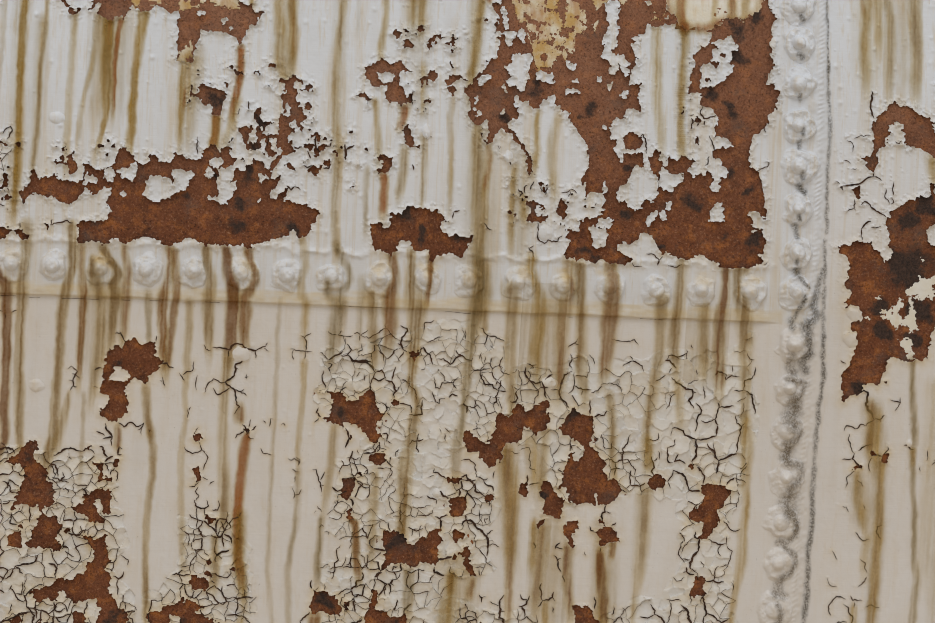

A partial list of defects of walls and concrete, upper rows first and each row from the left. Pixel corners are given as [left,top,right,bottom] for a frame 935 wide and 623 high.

peeling [61,0,265,116]
peeling [0,74,343,249]
peeling [356,0,780,269]
peeling [861,101,935,172]
peeling [838,183,935,402]
peeling [4,440,71,552]
peeling [29,534,128,623]
peeling [99,337,164,422]
peeling [314,389,399,466]
crack [0,320,756,623]
peeling [376,529,476,576]
peeling [463,400,626,548]